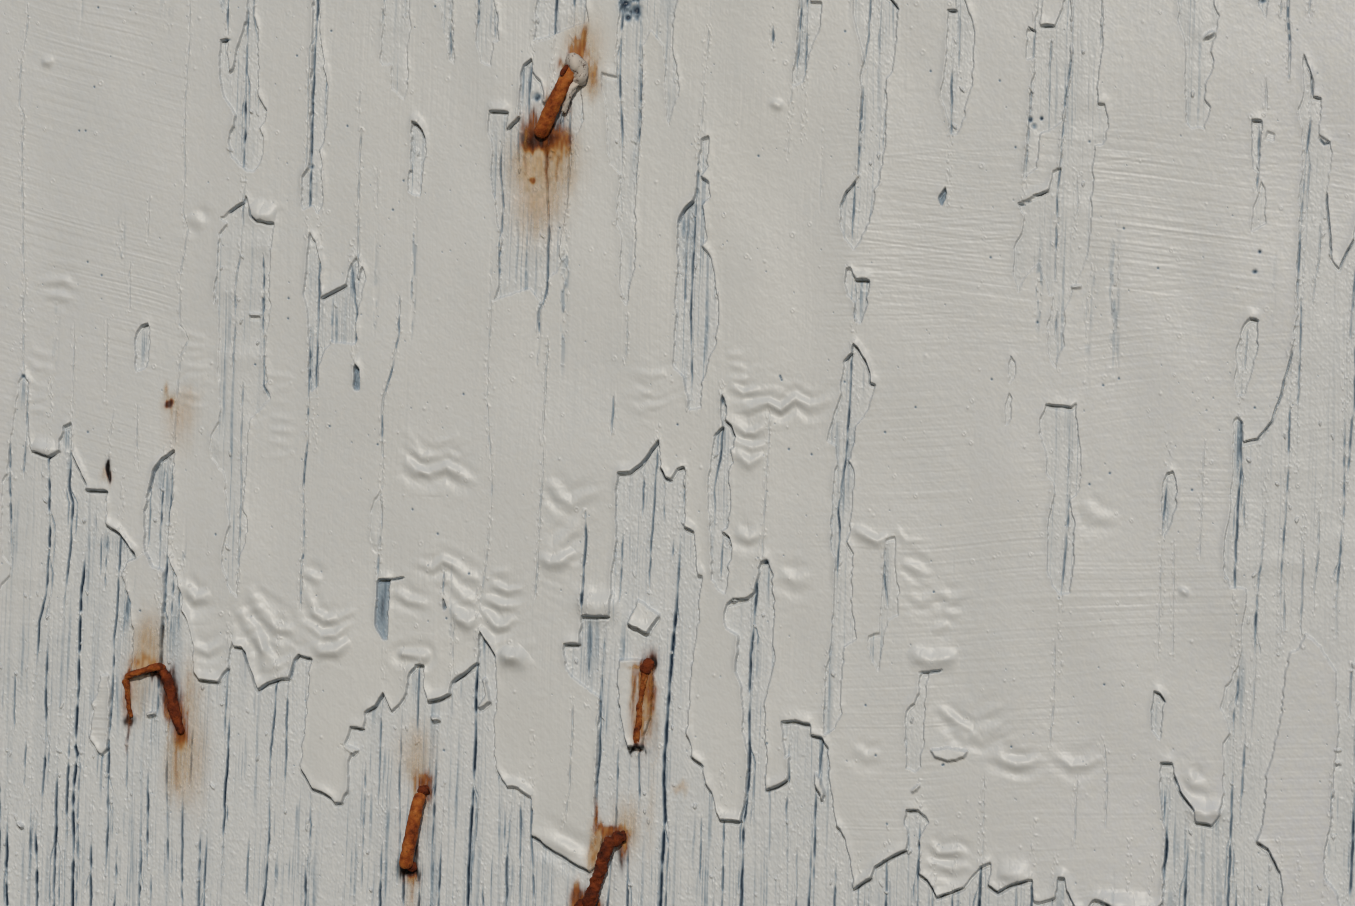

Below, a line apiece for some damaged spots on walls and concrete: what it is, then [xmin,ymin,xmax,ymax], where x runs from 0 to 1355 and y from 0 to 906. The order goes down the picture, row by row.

rust [518,109,571,219]
rust [559,28,597,86]
crack [1022,0,1104,340]
crack [0,0,378,906]
peeling [0,135,1108,906]
crack [361,0,921,906]
crack [1157,0,1355,906]
peeling [1157,56,1355,906]
rust [124,631,190,786]
rust [588,808,632,867]
rust [628,653,657,754]
peeling [1149,690,1167,742]